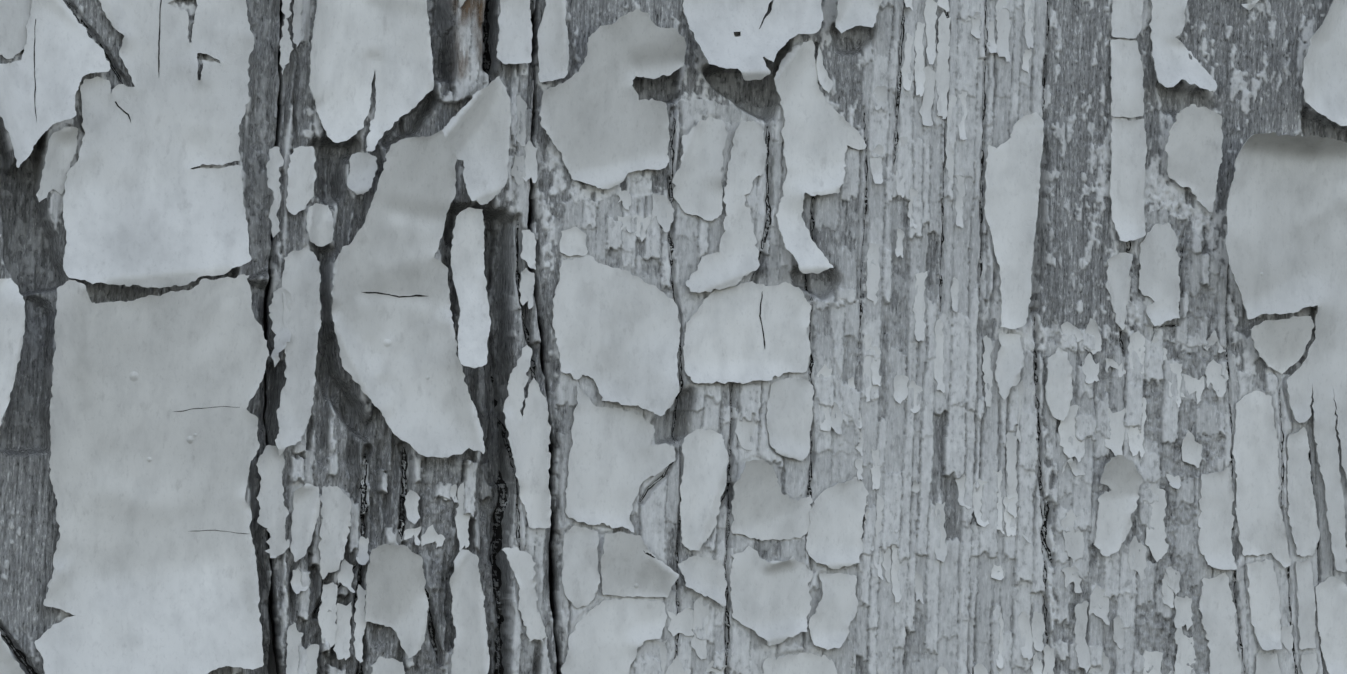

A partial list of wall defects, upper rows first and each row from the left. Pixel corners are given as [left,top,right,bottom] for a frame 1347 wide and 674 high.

peeling [0,0,959,674]
peeling [901,0,1347,674]